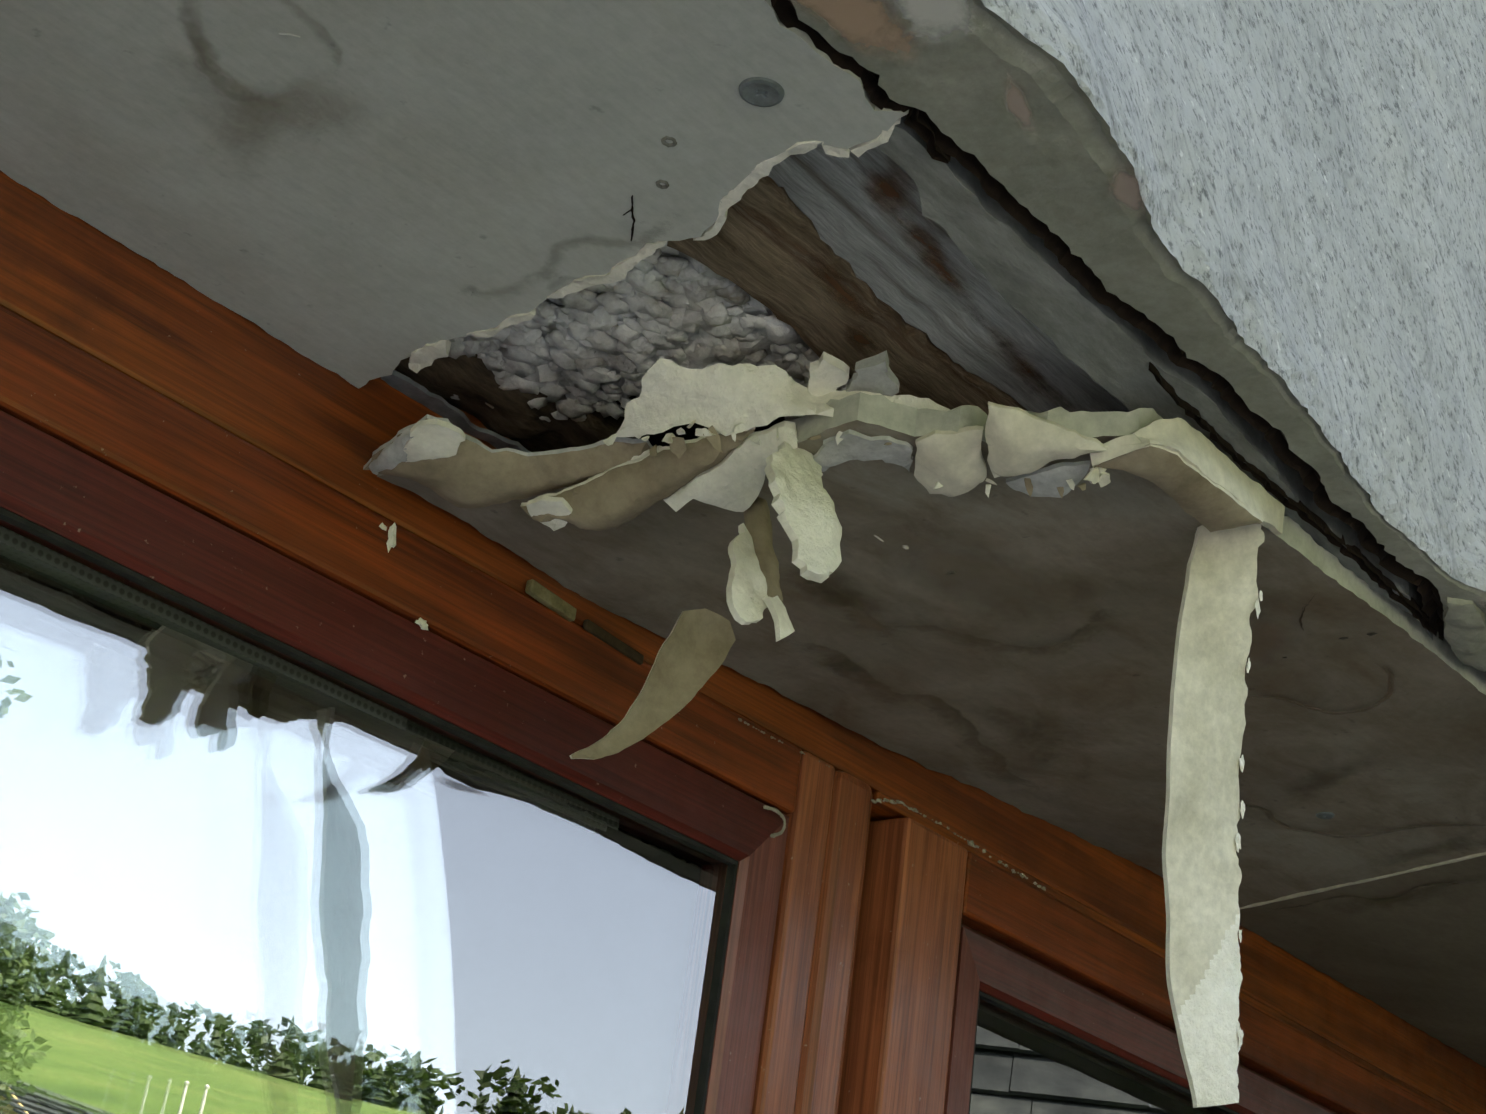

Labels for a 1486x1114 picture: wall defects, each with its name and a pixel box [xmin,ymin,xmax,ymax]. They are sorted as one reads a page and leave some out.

crack [623,195,635,241]
spalling [693,118,901,240]
peeling [1111,173,1141,209]
spalling [408,241,667,373]
crack [771,0,1444,641]
flaking render [363,350,1111,760]
peeling [1162,524,1265,1108]